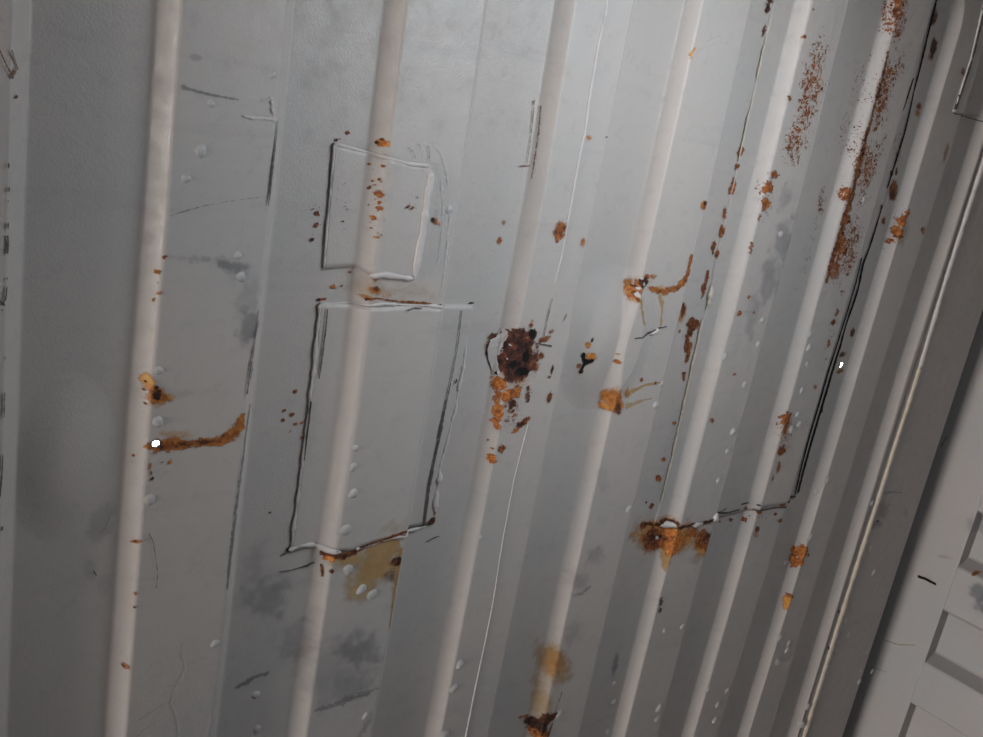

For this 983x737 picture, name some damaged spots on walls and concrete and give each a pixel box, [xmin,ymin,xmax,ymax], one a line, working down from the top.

corrosion [783,34,830,166]
corrosion [826,0,910,295]
corrosion [755,170,780,220]
corrosion [623,254,693,326]
corrosion [711,208,727,258]
crack [717,3,937,523]
corrosion [678,303,700,381]
corrosion [138,373,173,405]
corrosion [598,378,661,414]
corrosion [144,413,246,481]
corrosion [631,501,714,571]
corrosion [519,692,562,737]